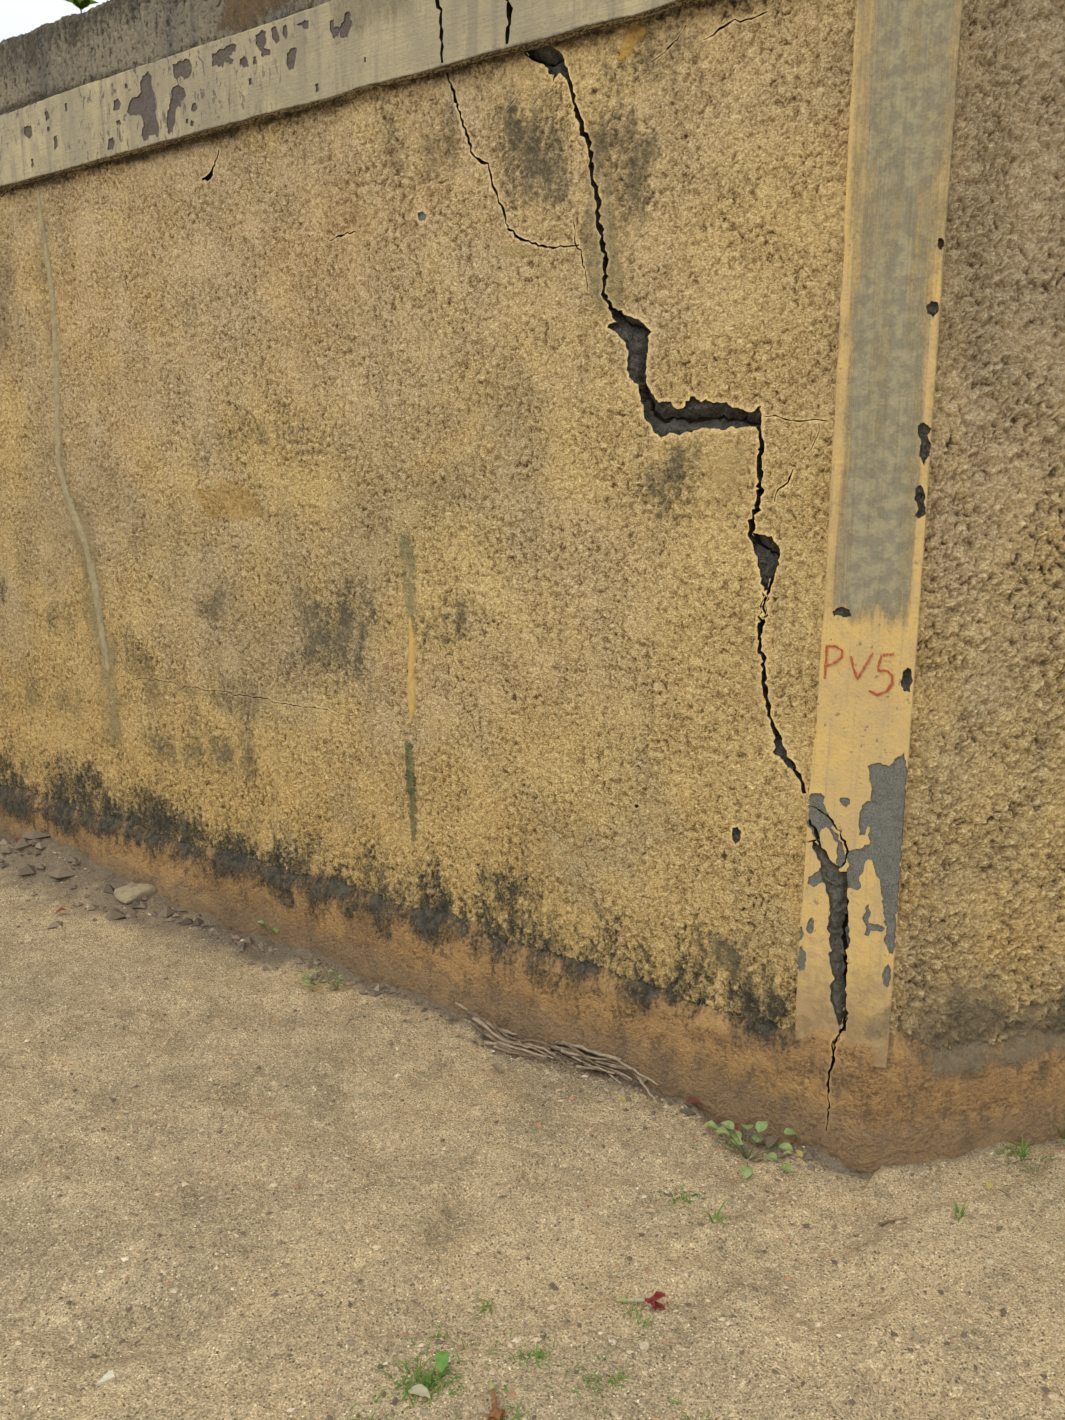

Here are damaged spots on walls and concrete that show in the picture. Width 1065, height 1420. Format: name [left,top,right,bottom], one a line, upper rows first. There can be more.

peeling [24,103,67,150]
peeling [107,58,197,150]
peeling [212,20,309,85]
peeling [330,12,353,39]
crack [435,0,651,333]
water stain [0,747,797,1050]
crack [639,381,849,1131]
peeling [798,753,908,1027]